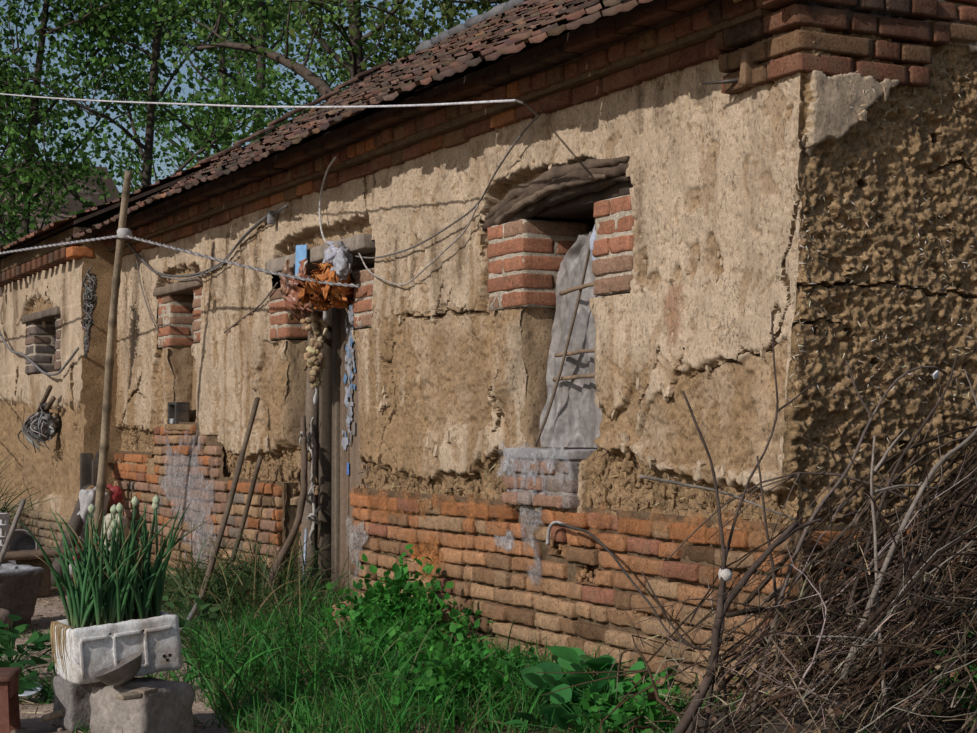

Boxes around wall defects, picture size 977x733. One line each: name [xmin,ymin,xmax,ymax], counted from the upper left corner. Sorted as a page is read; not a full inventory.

peeling [801,70,900,156]
crack [927,151,977,177]
crack [639,179,977,405]
crack [121,372,145,424]